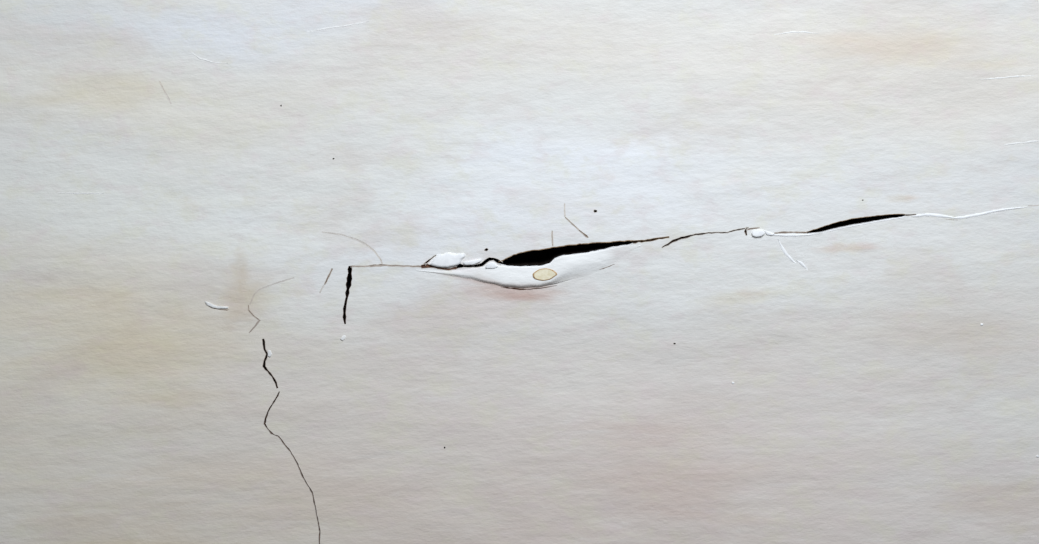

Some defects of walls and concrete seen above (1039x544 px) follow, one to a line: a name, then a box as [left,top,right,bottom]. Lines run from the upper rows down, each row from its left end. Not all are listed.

peeling [430,252,498,269]
crack [319,203,916,324]
crack [248,277,321,544]